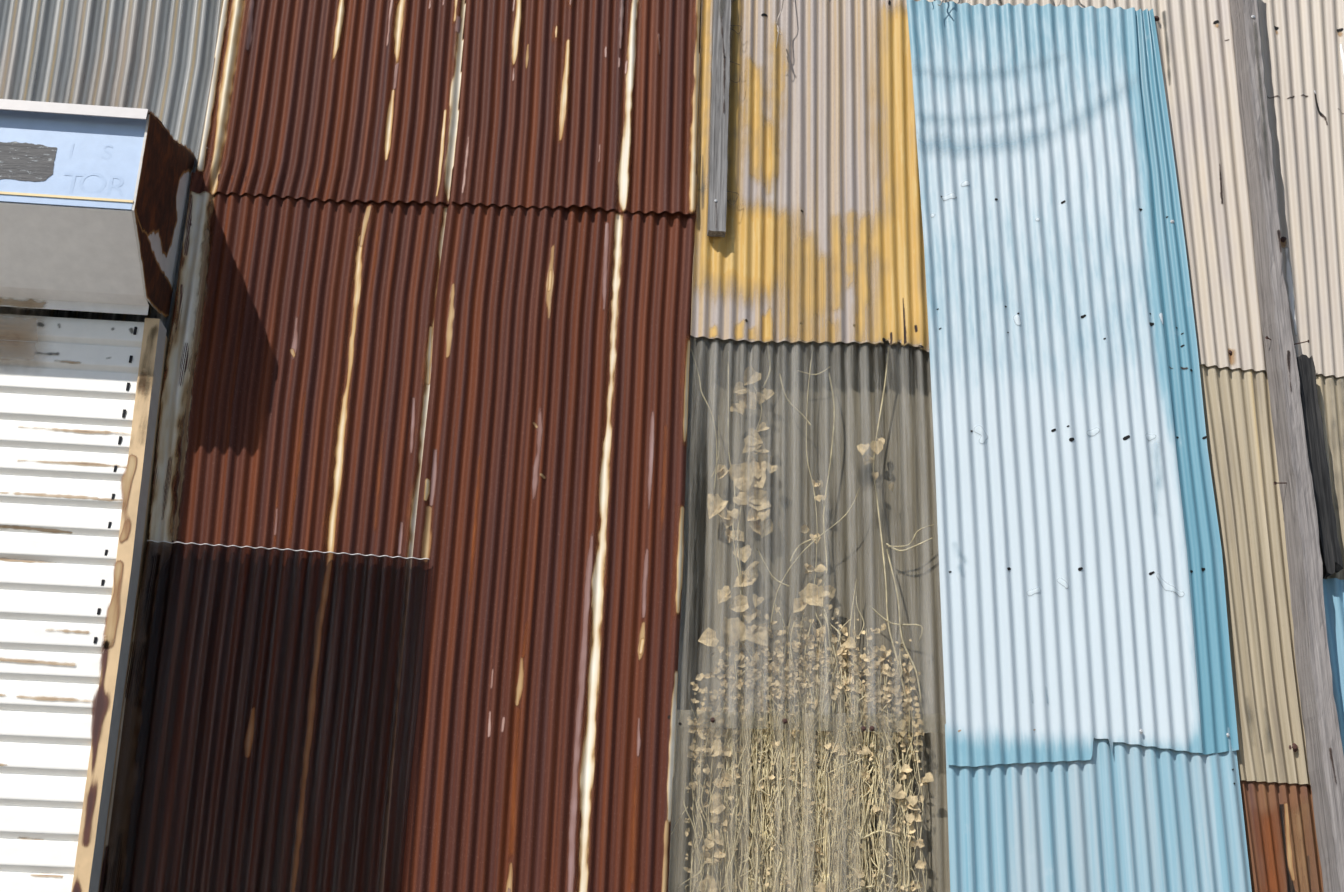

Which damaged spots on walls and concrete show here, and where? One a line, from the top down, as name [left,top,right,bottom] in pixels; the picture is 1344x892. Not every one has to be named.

rust [135,112,195,346]
rust [138,367,151,395]
rust [244,707,255,758]
rust [1264,817,1280,892]